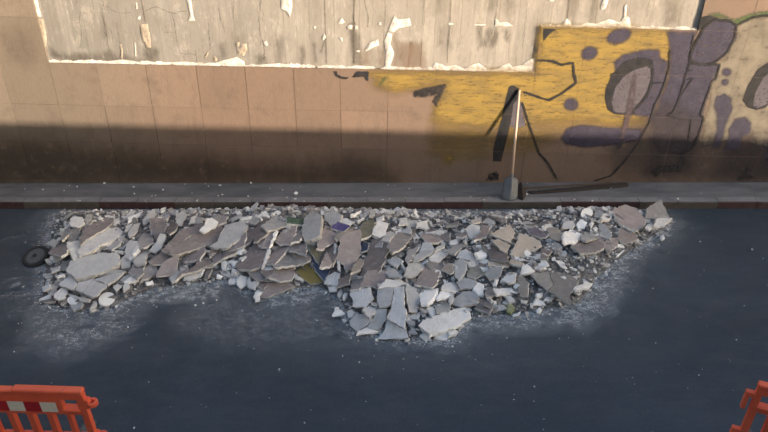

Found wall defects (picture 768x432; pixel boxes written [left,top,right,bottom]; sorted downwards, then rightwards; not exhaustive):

peeling [34,0,704,72]